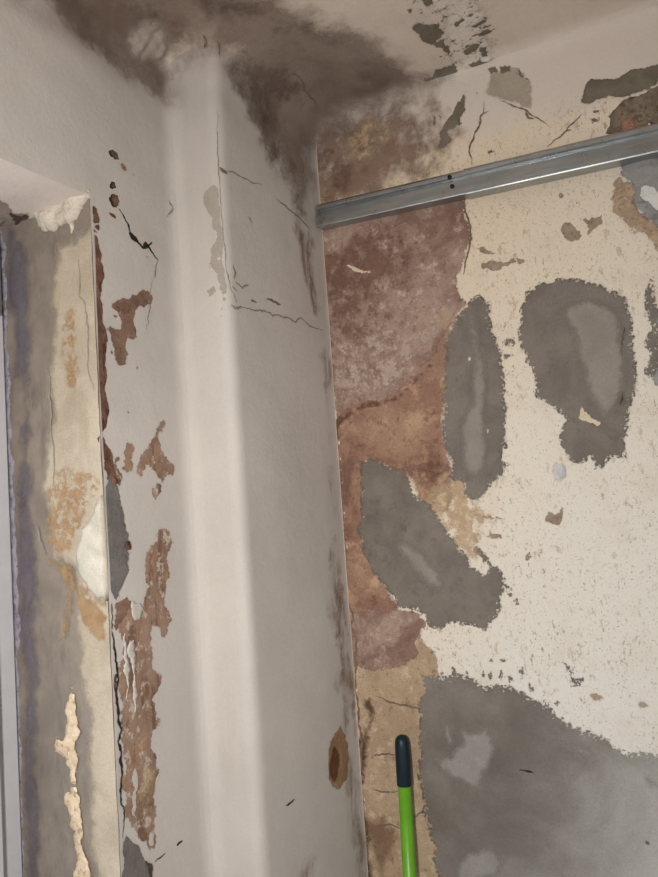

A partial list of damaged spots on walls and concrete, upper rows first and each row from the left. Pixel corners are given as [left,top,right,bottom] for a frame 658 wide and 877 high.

peeling [407,0,495,81]
damp [59,0,459,204]
crack [468,101,582,164]
flaking render [606,86,658,134]
crack [119,209,158,329]
crack [217,112,324,330]
peeling [322,200,524,412]
crack [463,200,472,274]
peeling [561,215,603,242]
flaking render [610,177,658,251]
peeling [0,188,174,877]
flaking render [353,638,468,877]